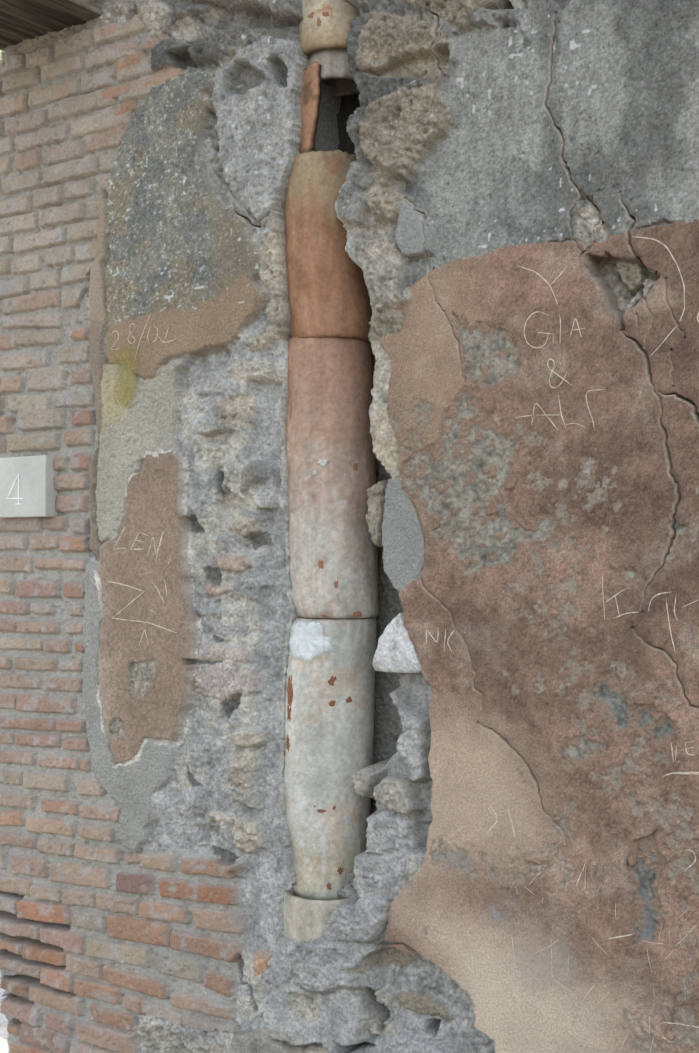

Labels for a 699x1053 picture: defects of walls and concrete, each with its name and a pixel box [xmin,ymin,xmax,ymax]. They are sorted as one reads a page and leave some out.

crack [541,13,657,277]
spalling [399,312,559,574]
spalling [578,454,599,487]
crack [620,330,699,712]
spalling [129,659,155,698]
peeling [284,676,293,763]
crack [403,488,569,846]
spalling [627,830,668,944]